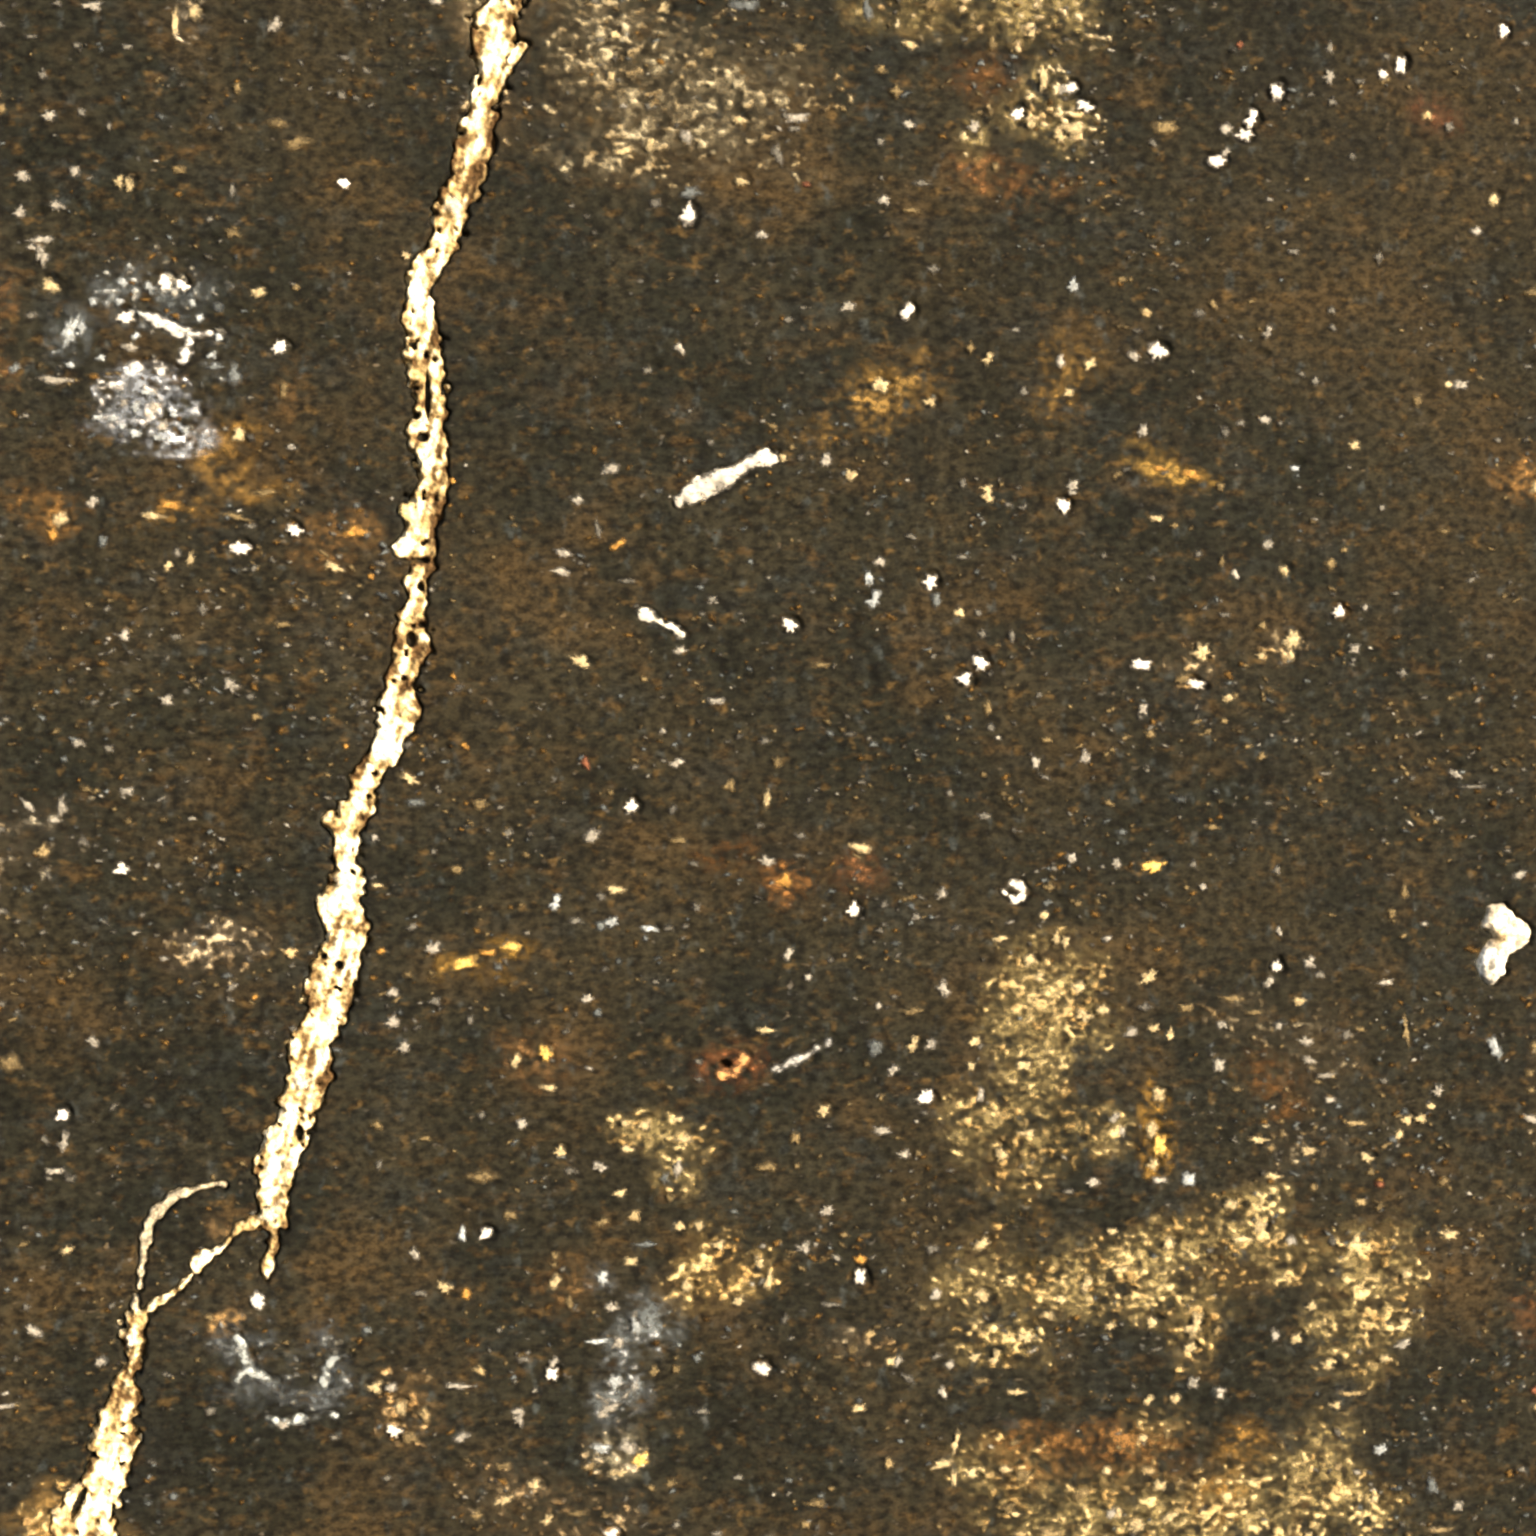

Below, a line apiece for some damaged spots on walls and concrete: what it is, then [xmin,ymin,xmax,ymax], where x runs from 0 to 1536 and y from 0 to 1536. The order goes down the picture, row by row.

damp [91,243,224,458]
crack [23,0,528,1536]